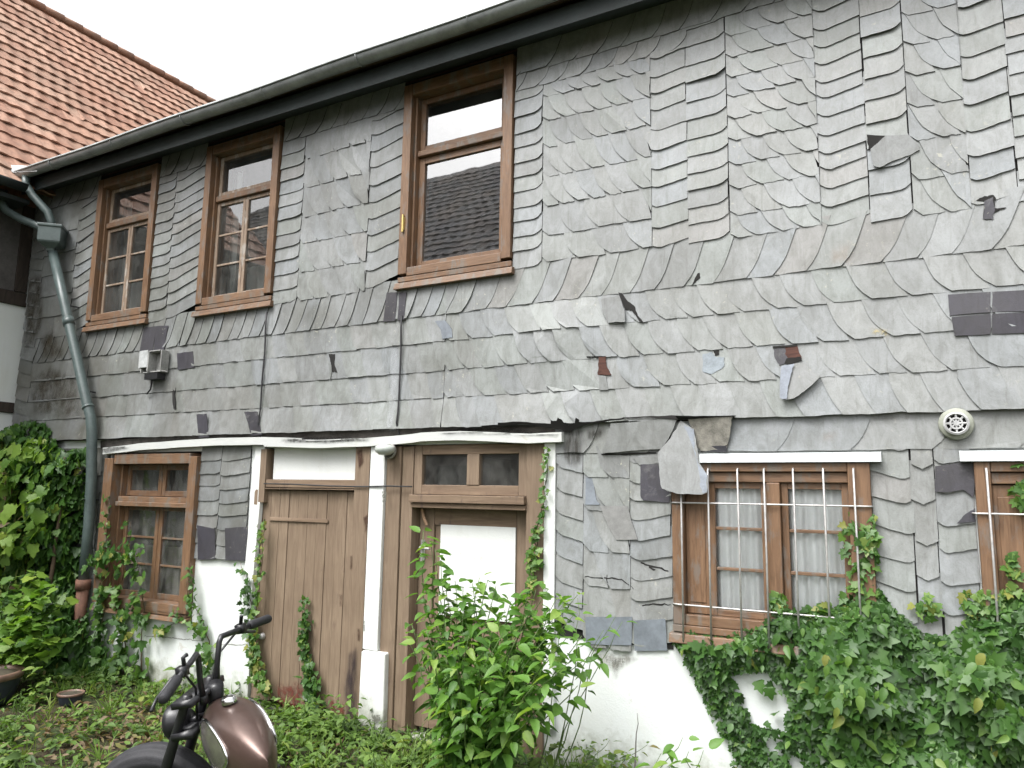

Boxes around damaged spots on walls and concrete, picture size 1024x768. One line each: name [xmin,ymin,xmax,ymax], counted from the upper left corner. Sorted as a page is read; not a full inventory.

water stain [26,279,61,356]
peeling [780,364,794,399]
peeling [633,456,659,465]
spalling [675,415,735,493]